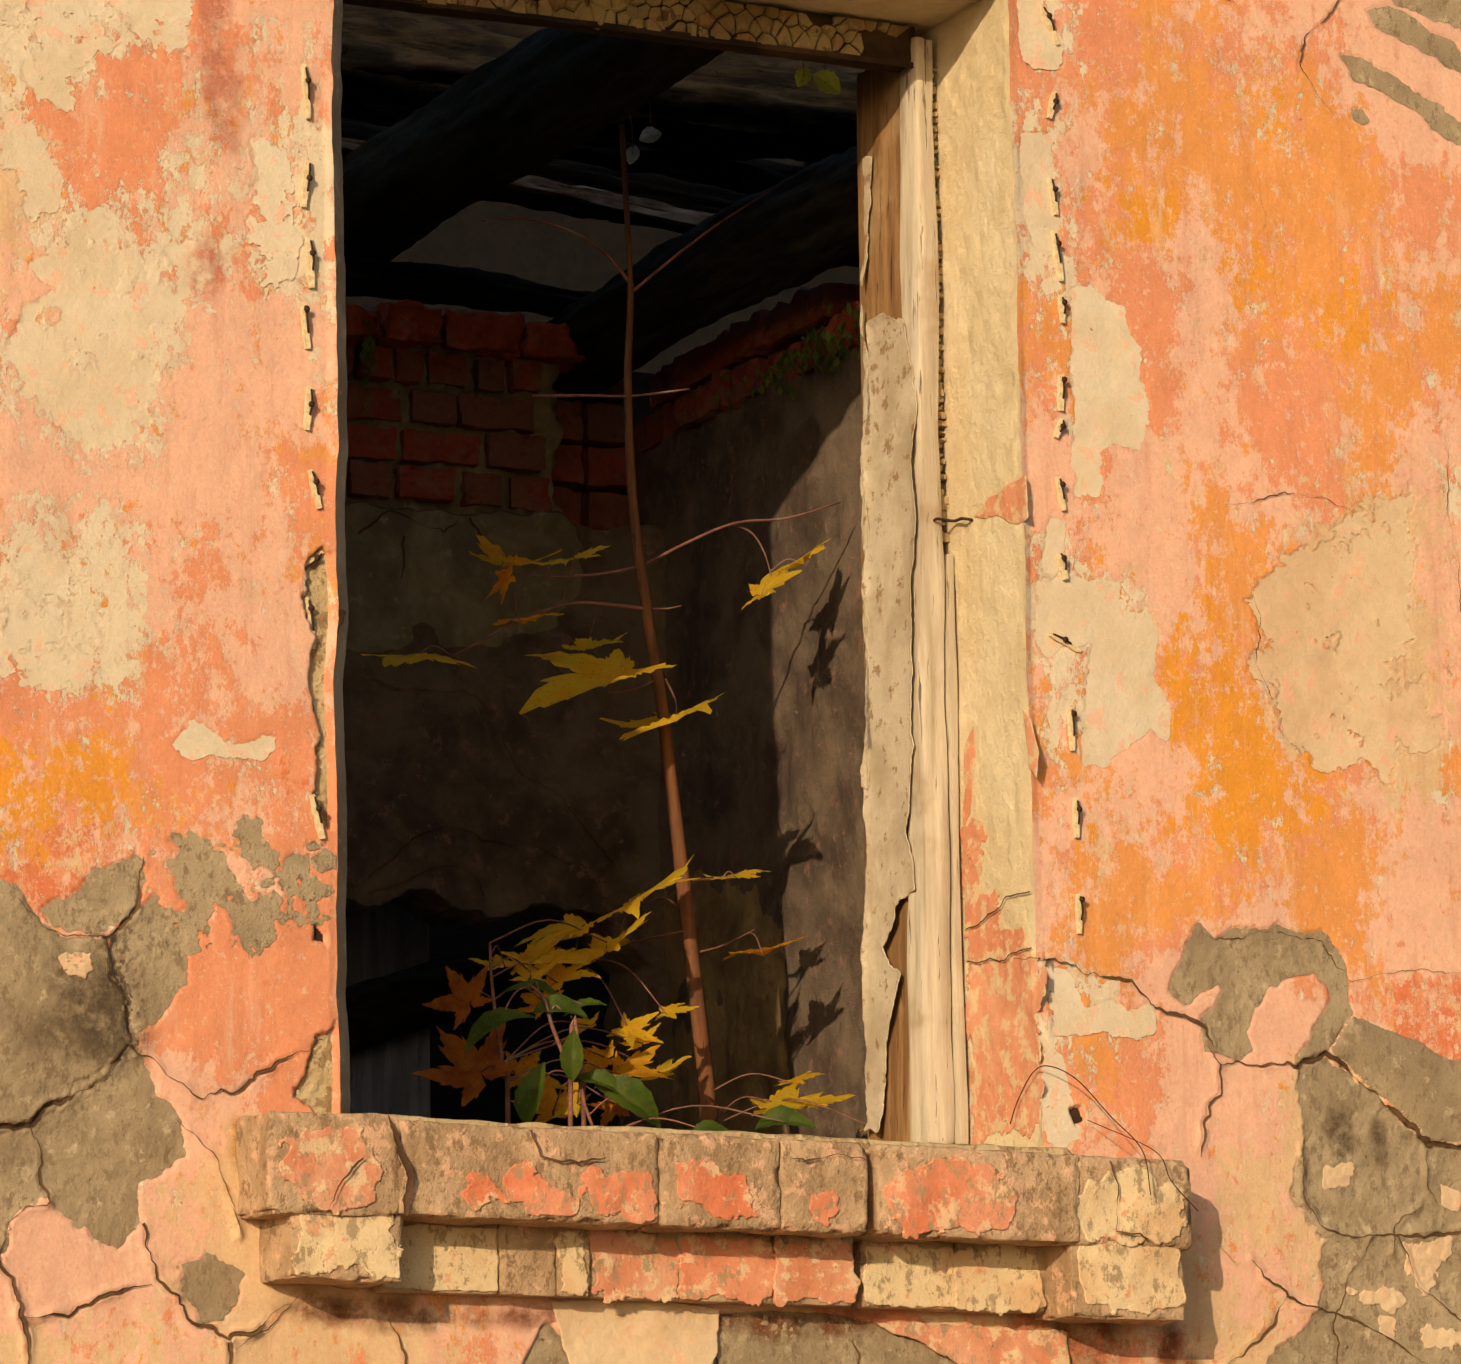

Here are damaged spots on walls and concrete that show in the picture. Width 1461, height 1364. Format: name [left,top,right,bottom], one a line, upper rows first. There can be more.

crack [1299,0,1339,118]
spalling [1367,0,1461,73]
peeling [1070,285,1150,498]
crack [0,856,322,1364]
flaking render [0,503,583,1254]
crack [388,1315,407,1364]
peeling [278,725,1157,1364]
peeling [859,305,917,1133]
peeling [1076,1164,1188,1315]
crack [965,891,1461,1364]
spalling [1169,922,1461,1364]
peeling [1245,485,1446,788]